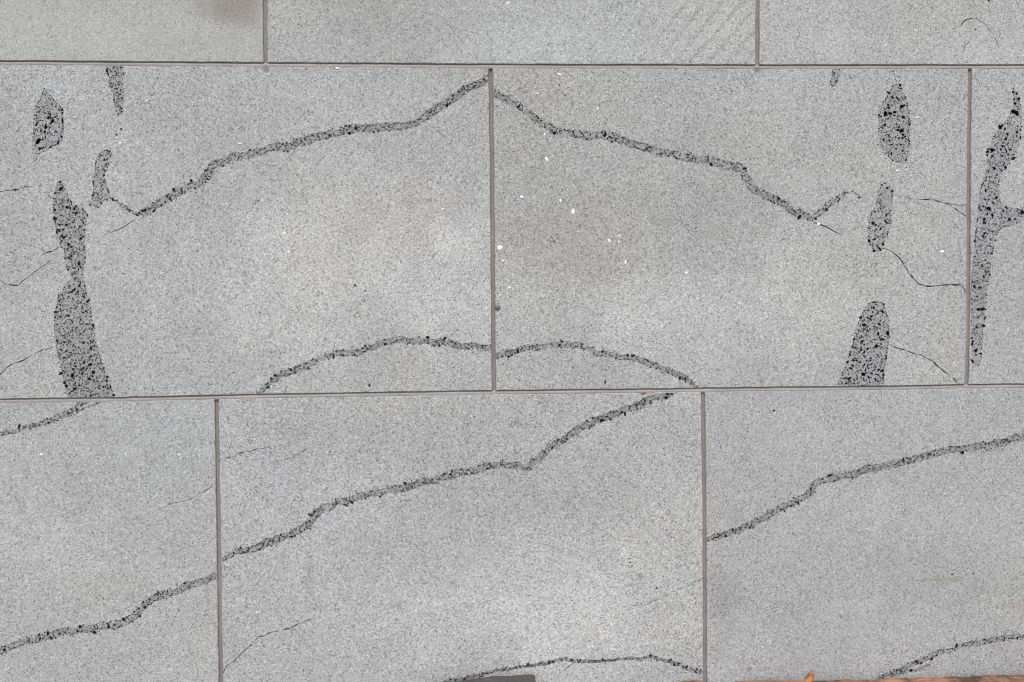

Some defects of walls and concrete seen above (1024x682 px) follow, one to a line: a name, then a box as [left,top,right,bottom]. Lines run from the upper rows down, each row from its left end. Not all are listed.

spalling [32,88,64,162]
crack [110,75,862,235]
spalling [876,70,911,168]
spalling [53,66,125,397]
spalling [867,181,894,252]
spalling [971,88,1024,367]
spalling [836,301,890,386]
crack [0,335,698,655]
crack [707,433,1024,542]
crack [223,618,314,673]
crack [442,654,703,682]
crack [876,634,1024,679]